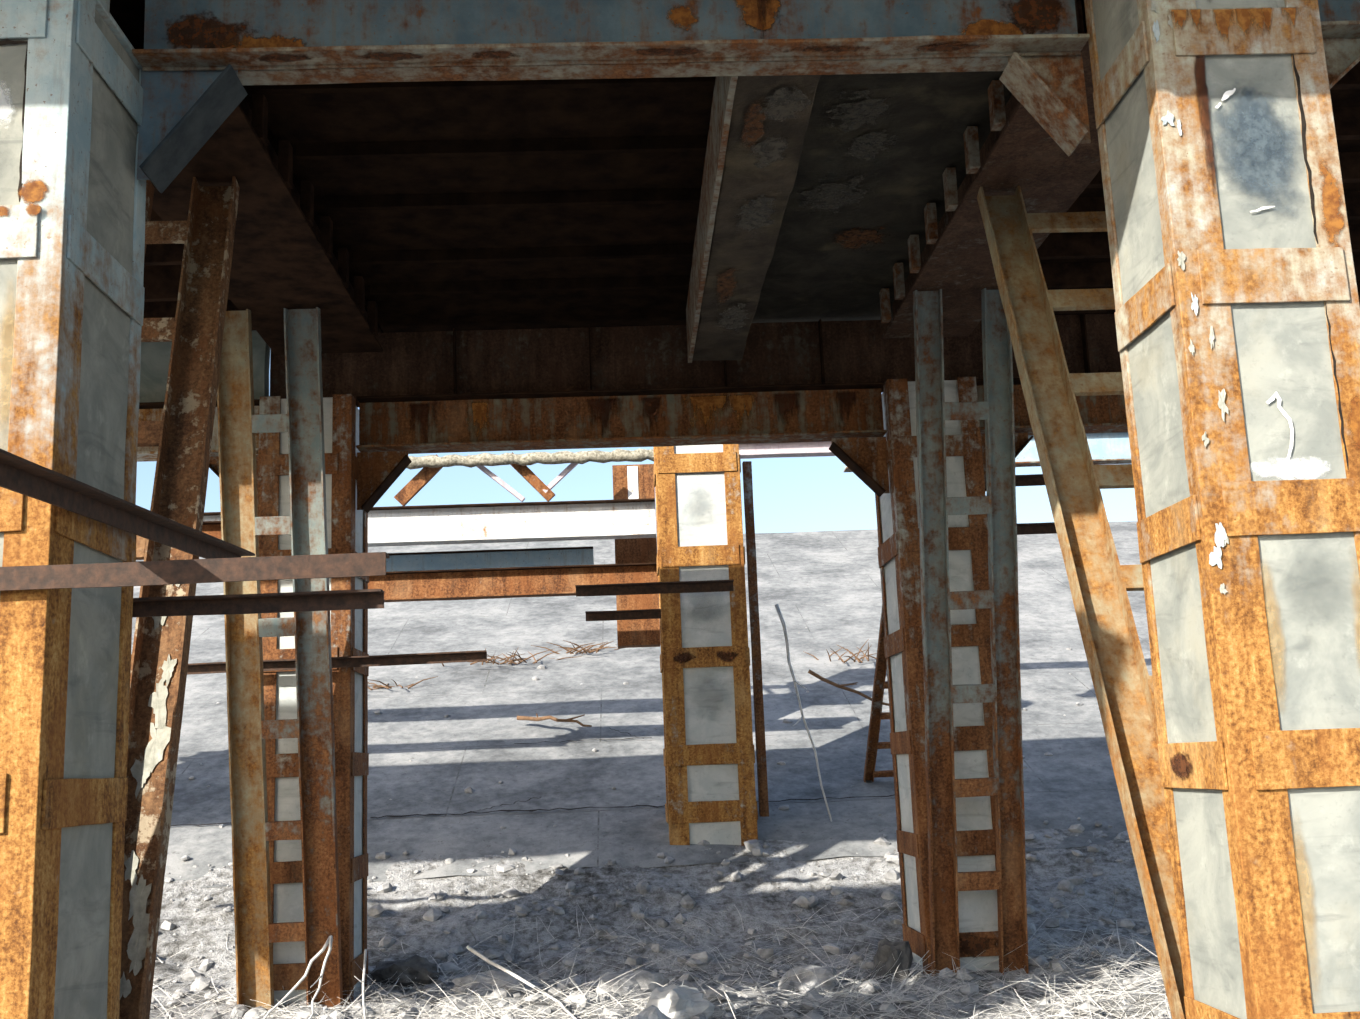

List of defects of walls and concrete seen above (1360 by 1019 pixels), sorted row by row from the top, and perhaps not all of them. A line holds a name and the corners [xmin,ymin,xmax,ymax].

rust [166,12,311,62]
rust [735,0,781,35]
rust [917,0,1062,52]
water stain [0,91,10,119]
water stain [1215,91,1295,201]
rust [19,180,48,216]
peeling [1218,389,1229,421]
peeling [1209,523,1229,594]
peeling [152,616,167,630]
peeling [130,655,177,798]
rust [1170,753,1192,779]
peeling [120,850,152,999]